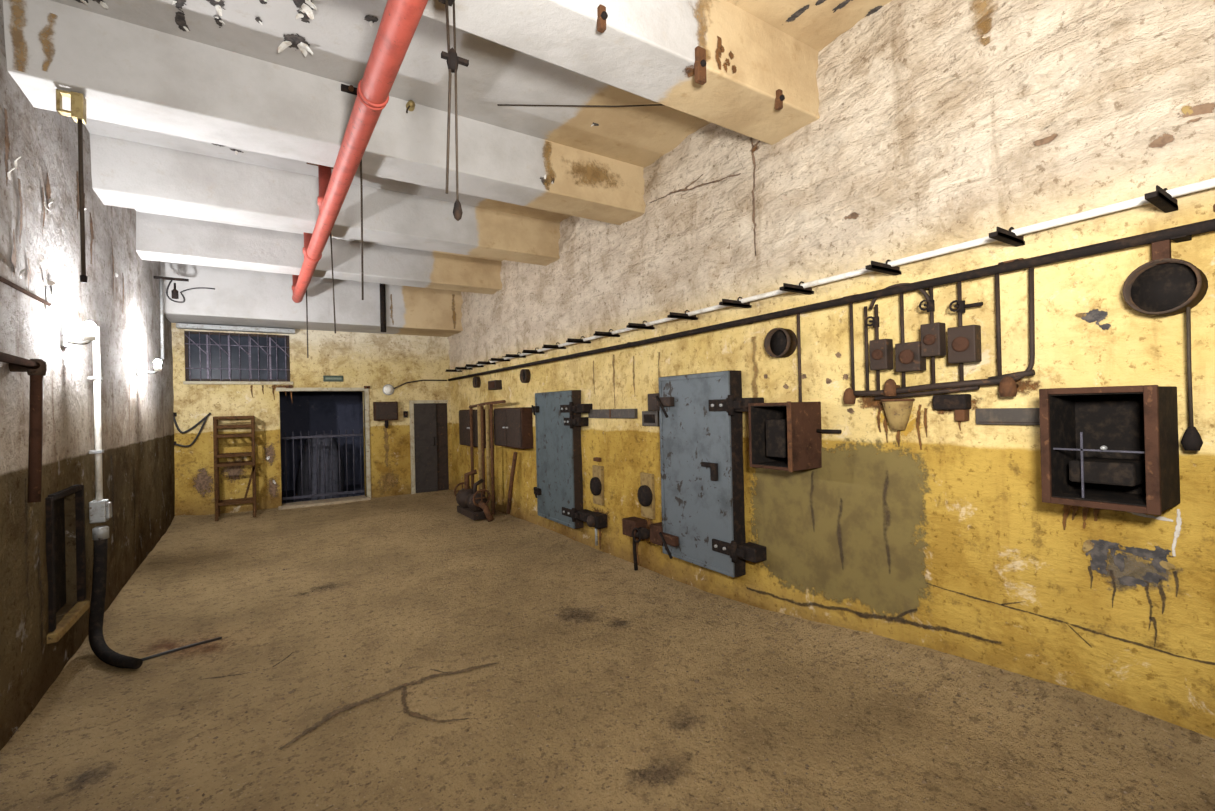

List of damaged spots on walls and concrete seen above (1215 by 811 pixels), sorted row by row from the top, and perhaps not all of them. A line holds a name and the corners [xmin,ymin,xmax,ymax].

peeling [172,0,190,32]
peeling [206,0,226,28]
peeling [278,0,317,57]
damp [683,0,722,78]
rust [1062,505,1100,530]
crack [746,583,1215,665]
crack [278,663,499,750]